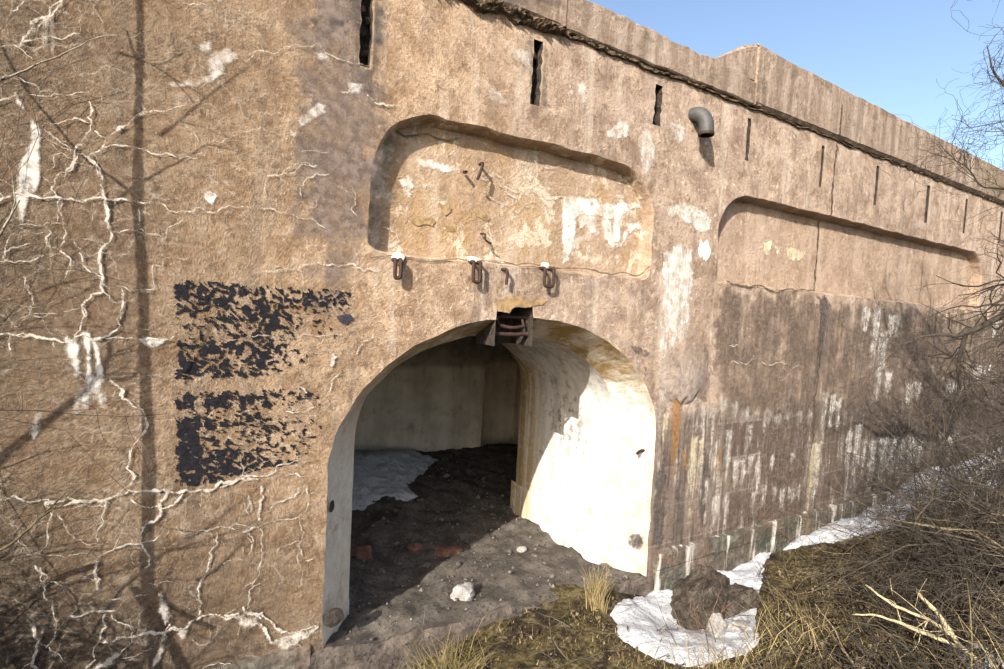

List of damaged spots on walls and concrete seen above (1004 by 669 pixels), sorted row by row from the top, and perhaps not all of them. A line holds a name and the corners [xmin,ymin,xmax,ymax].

crack [0,0,650,350]
peeling [562,197,641,263]
peeling [668,204,711,232]
peeling [174,388,322,486]
peeling [173,280,351,380]
crack [252,334,373,413]
spalling [496,296,547,313]
efflorescence [660,245,693,352]
water stain [685,288,1004,528]
crack [0,381,319,669]
water stain [652,460,683,544]